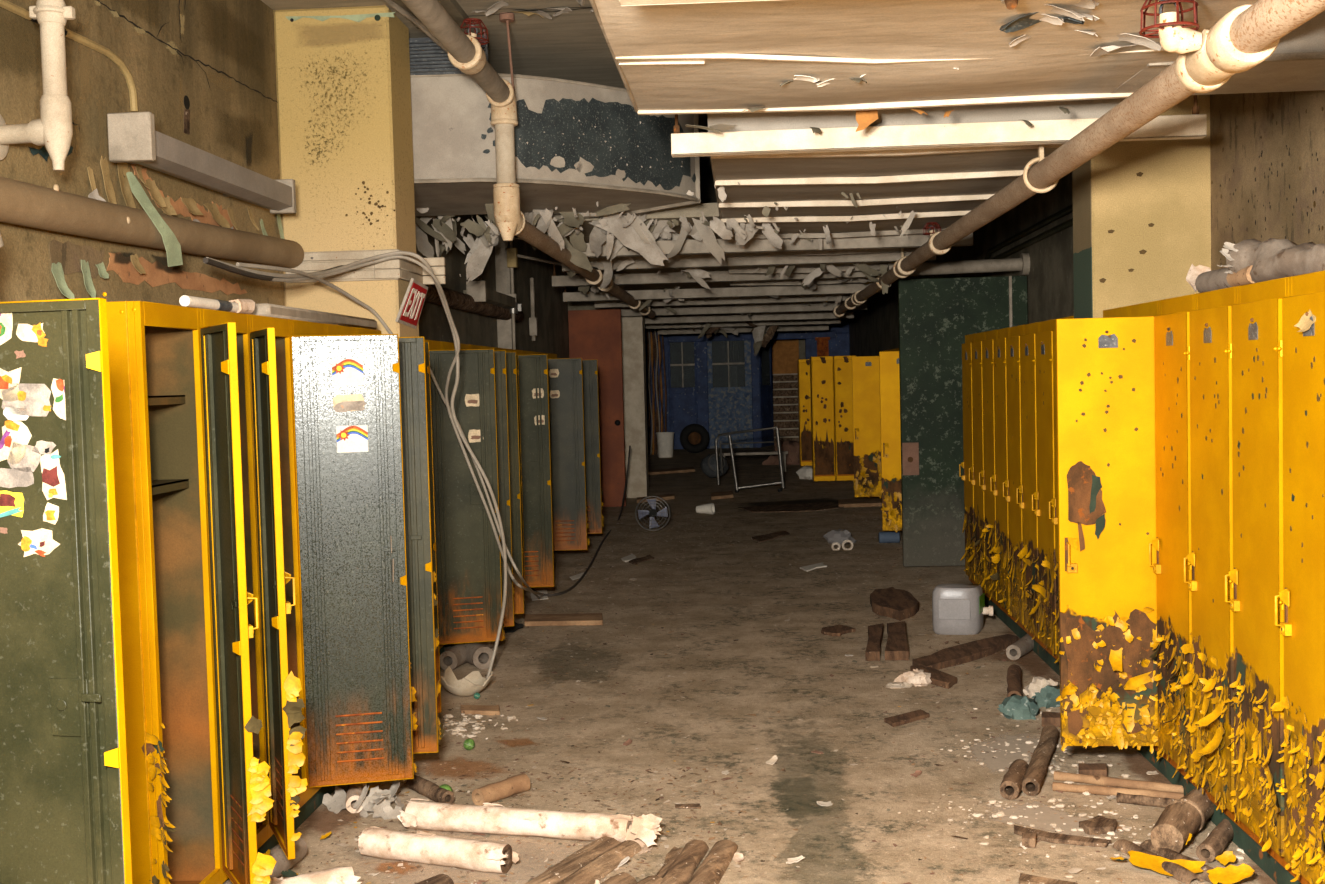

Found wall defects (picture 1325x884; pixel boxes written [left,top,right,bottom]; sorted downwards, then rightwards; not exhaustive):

peeling [467,0,594,19]
peeling [999,0,1162,57]
damp [300,44,370,167]
peeling [481,103,495,154]
peeling [514,98,766,196]
peeling [48,156,284,299]
peeling [415,204,500,283]
peeling [523,202,889,314]
peeling [714,182,740,202]
peeling [869,206,917,237]
spalling [1255,145,1324,239]
peeling [692,296,779,356]